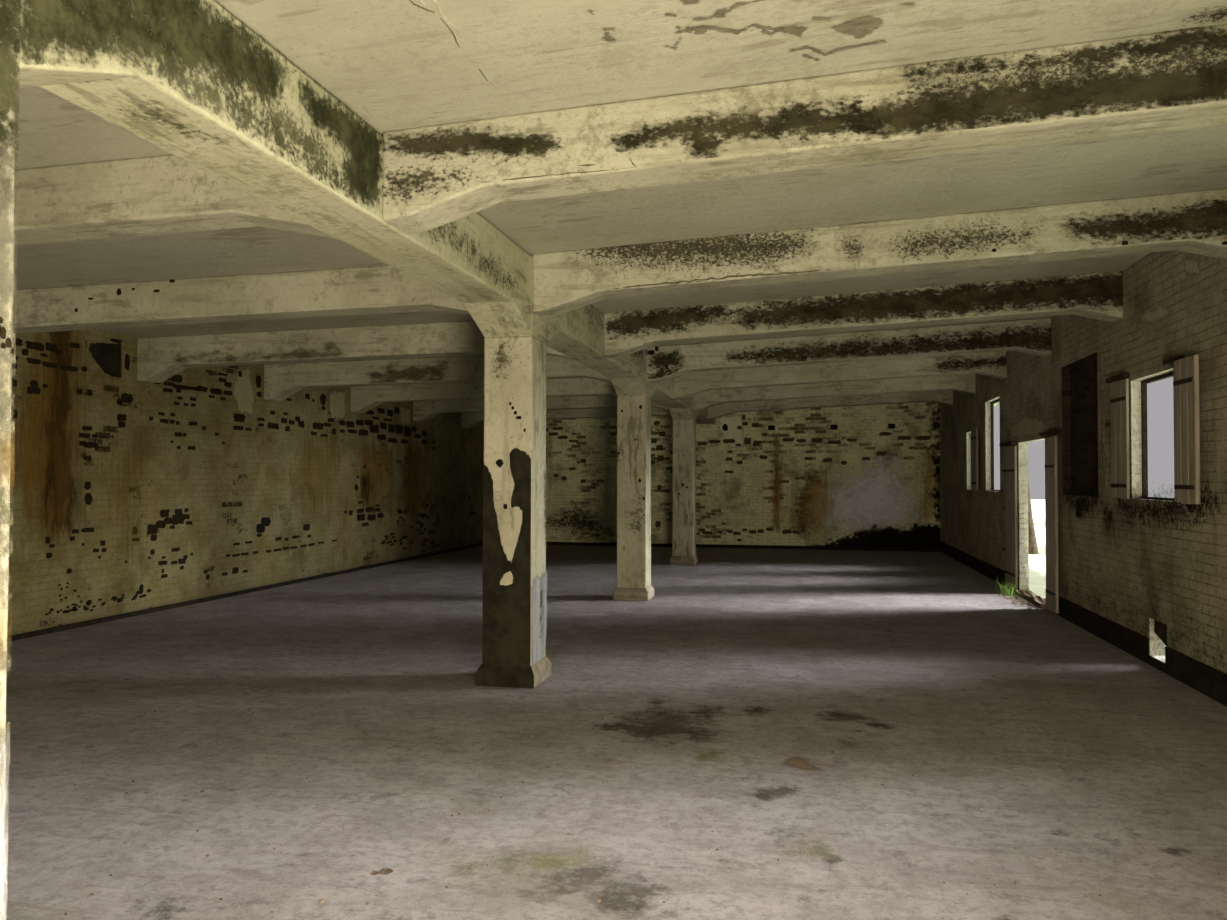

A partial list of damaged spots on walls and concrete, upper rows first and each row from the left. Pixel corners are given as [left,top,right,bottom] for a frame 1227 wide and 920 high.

crack [409,0,508,102]
peeling [664,0,887,61]
water stain [611,6,1227,159]
flaking render [0,317,130,394]
water stain [0,0,561,599]
water stain [569,228,817,279]
water stain [585,271,1123,379]
water stain [1066,196,1227,245]
rust [21,331,79,536]
flaking render [233,393,427,444]
flaking render [131,508,193,578]
flaking render [482,448,531,666]